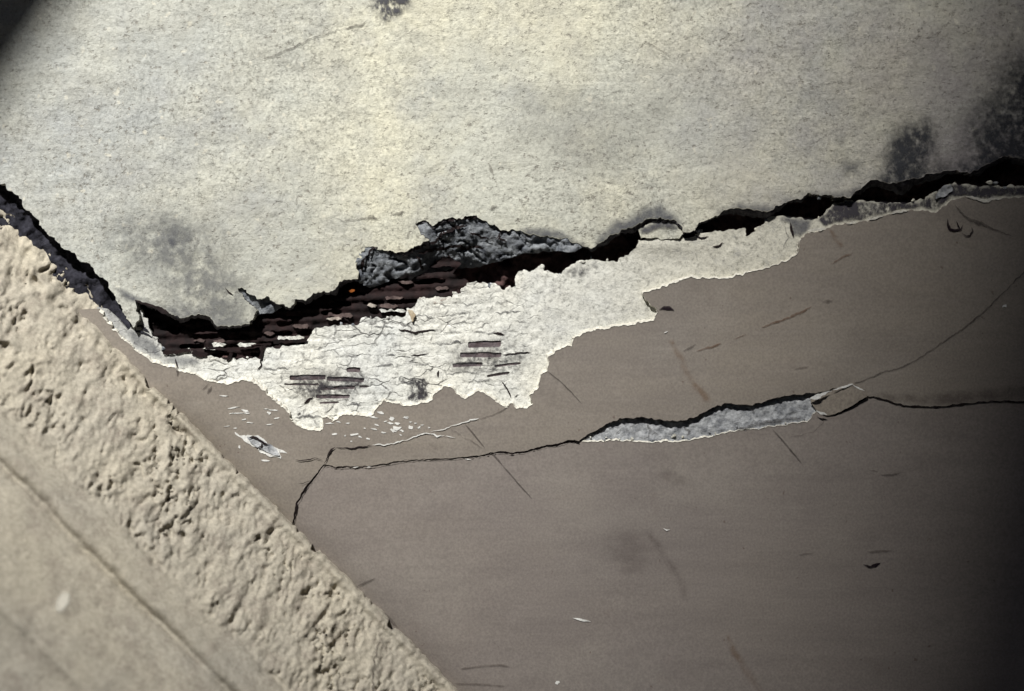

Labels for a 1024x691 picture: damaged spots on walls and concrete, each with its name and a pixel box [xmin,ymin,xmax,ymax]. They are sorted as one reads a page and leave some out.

leakage [882,125,934,183]
leakage [958,64,1024,172]
flaking render [97,182,1024,462]
crack [833,363,1024,415]
crack [292,418,576,525]